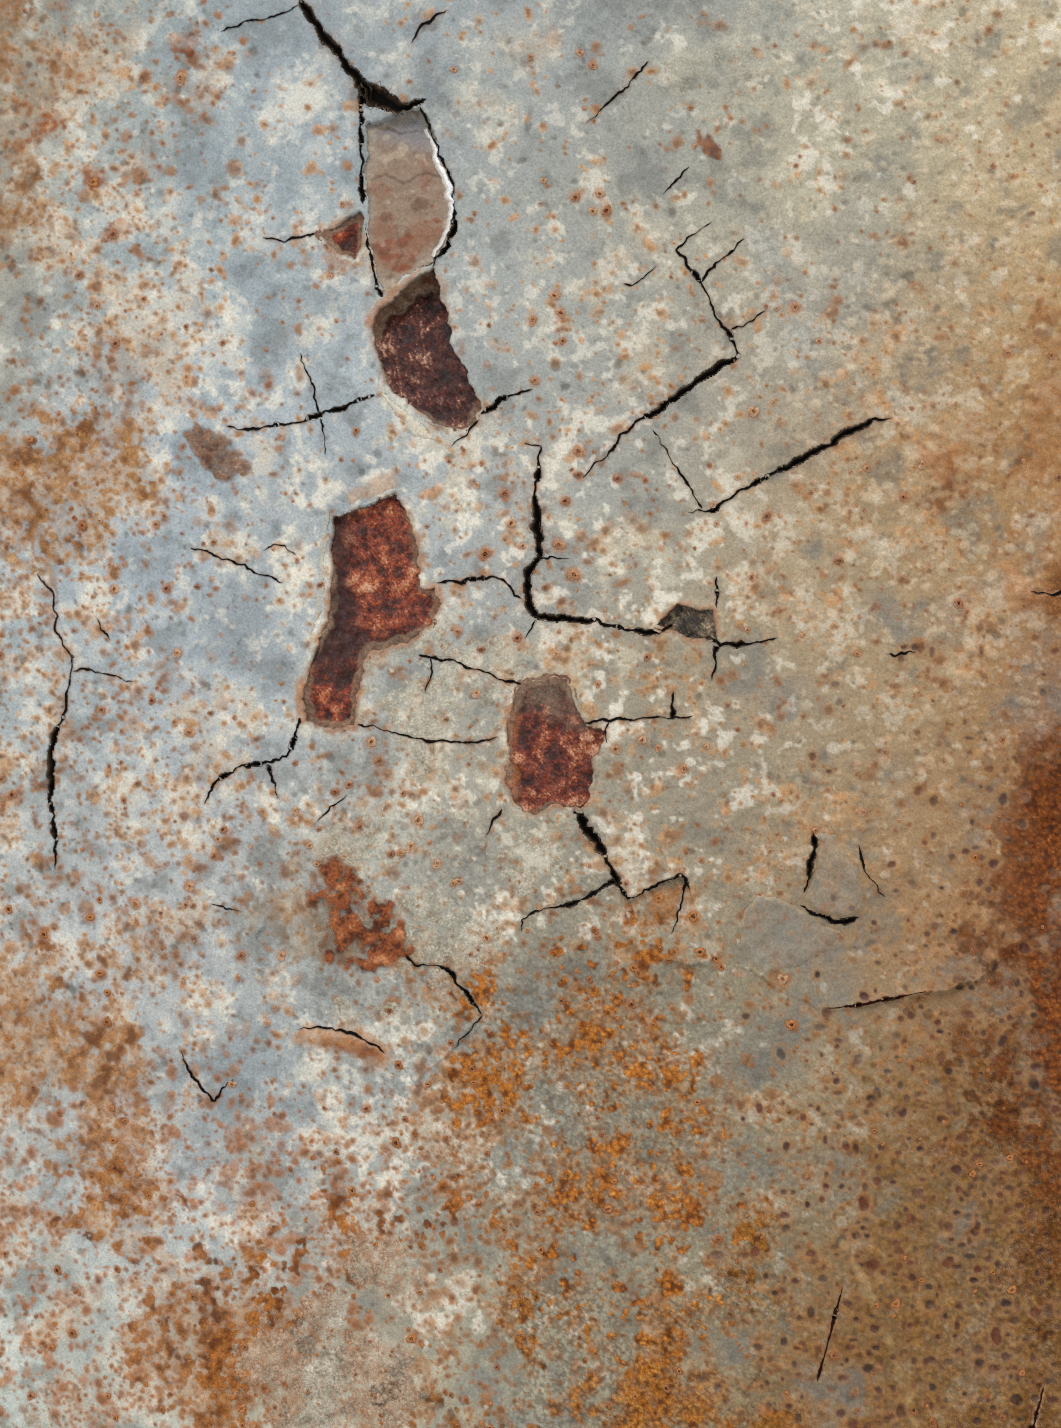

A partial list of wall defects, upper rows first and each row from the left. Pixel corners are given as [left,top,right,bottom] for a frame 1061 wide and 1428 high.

rust [0,401,157,590]
crack [37,574,134,868]
rust [254,827,415,973]
crack [221,0,458,296]
peeling [298,487,446,735]
peeling [313,110,486,443]
rust [0,880,800,1428]
crack [437,443,673,638]
peeling [500,673,610,820]
crack [521,807,690,932]
crack [583,222,890,514]
rust [954,727,1061,1305]